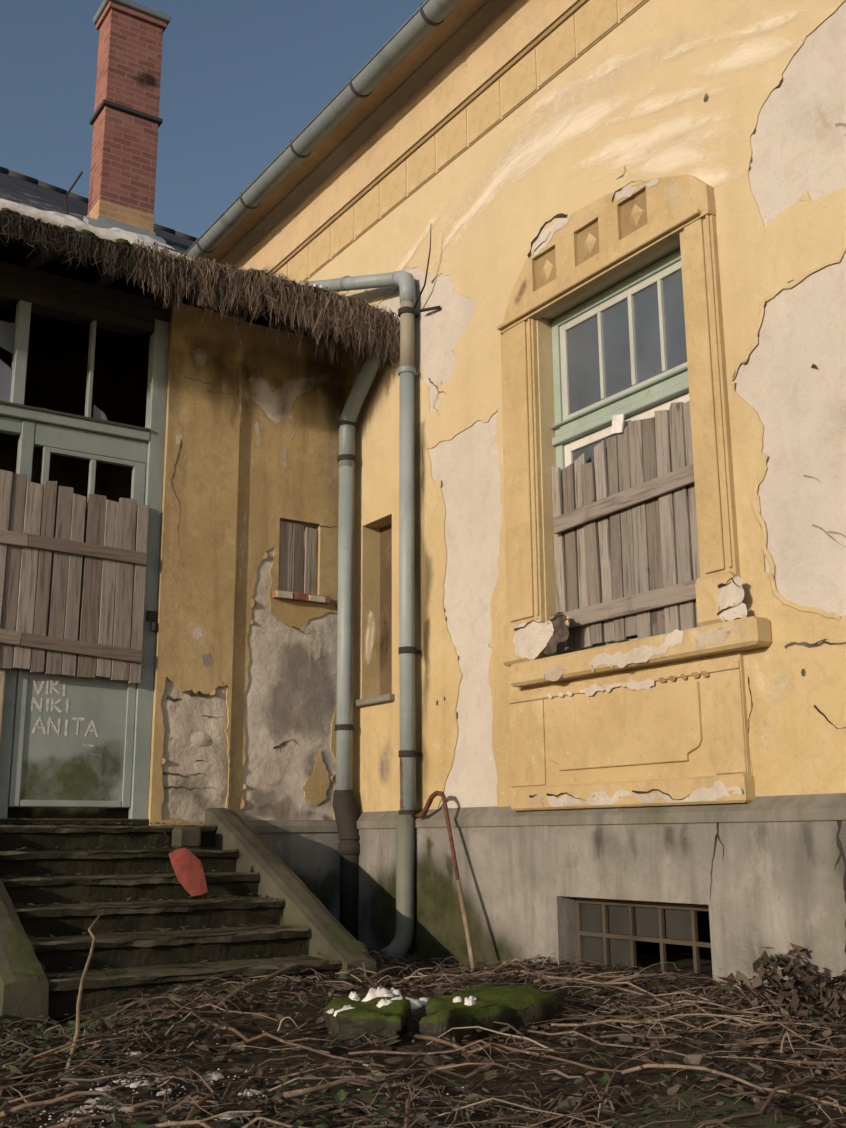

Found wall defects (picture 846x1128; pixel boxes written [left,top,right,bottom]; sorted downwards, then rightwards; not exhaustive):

peeling [748,1,846,226]
peeling [373,287,400,324]
peeling [402,267,475,412]
peeling [728,253,846,619]
peeling [160,548,337,822]
leakage [268,625,335,735]
peeling [428,411,502,809]
peeling [513,576,747,698]
crack [784,639,846,649]
flaking render [529,781,743,808]
crack [710,822,724,895]
crack [834,820,846,974]